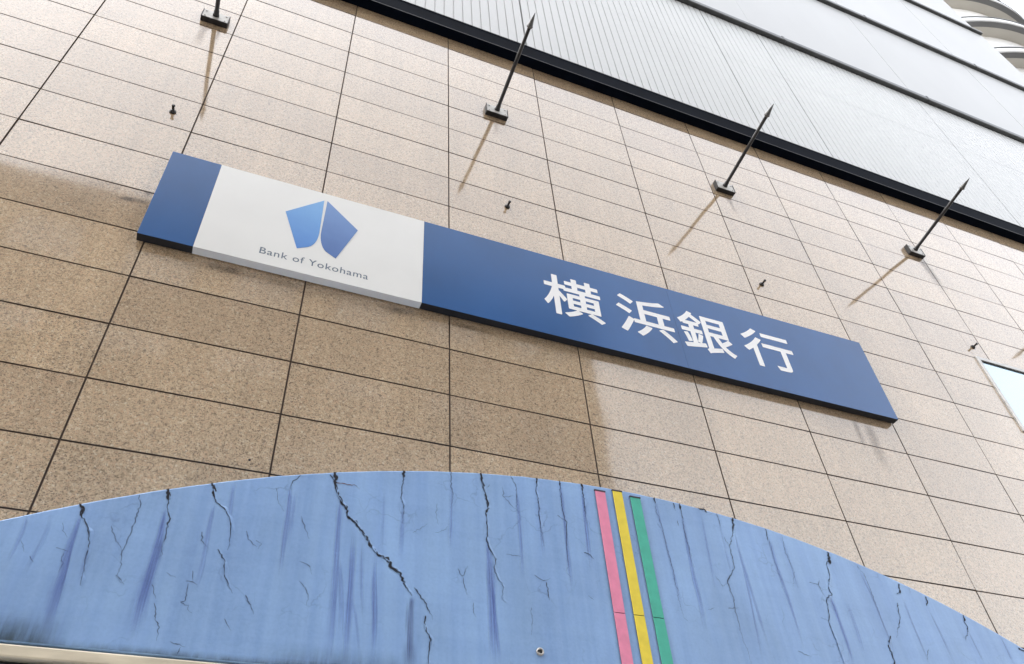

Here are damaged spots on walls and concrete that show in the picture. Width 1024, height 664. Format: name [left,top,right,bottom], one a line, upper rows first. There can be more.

crack [59,495,141,586]
crack [152,488,194,654]
crack [201,483,259,609]
crack [330,472,434,664]
crack [401,470,453,533]
crack [480,473,595,635]
crack [766,529,846,664]